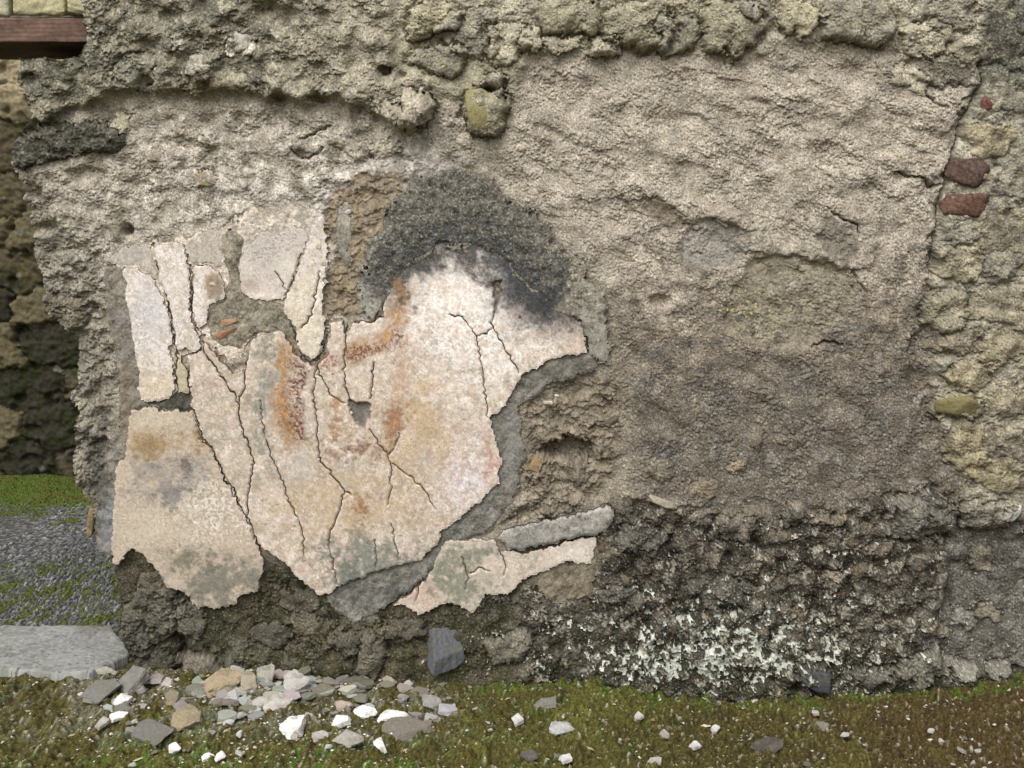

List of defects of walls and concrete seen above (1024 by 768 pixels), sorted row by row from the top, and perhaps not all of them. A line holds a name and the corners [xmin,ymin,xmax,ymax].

spalling [315,172,402,318]
leakage [360,206,575,325]
crack [154,246,384,581]
spalling [350,400,370,426]
crack [450,314,519,418]
spalling [539,391,619,442]
crack [370,430,434,565]
spalling [529,457,592,487]
crack [463,550,506,587]